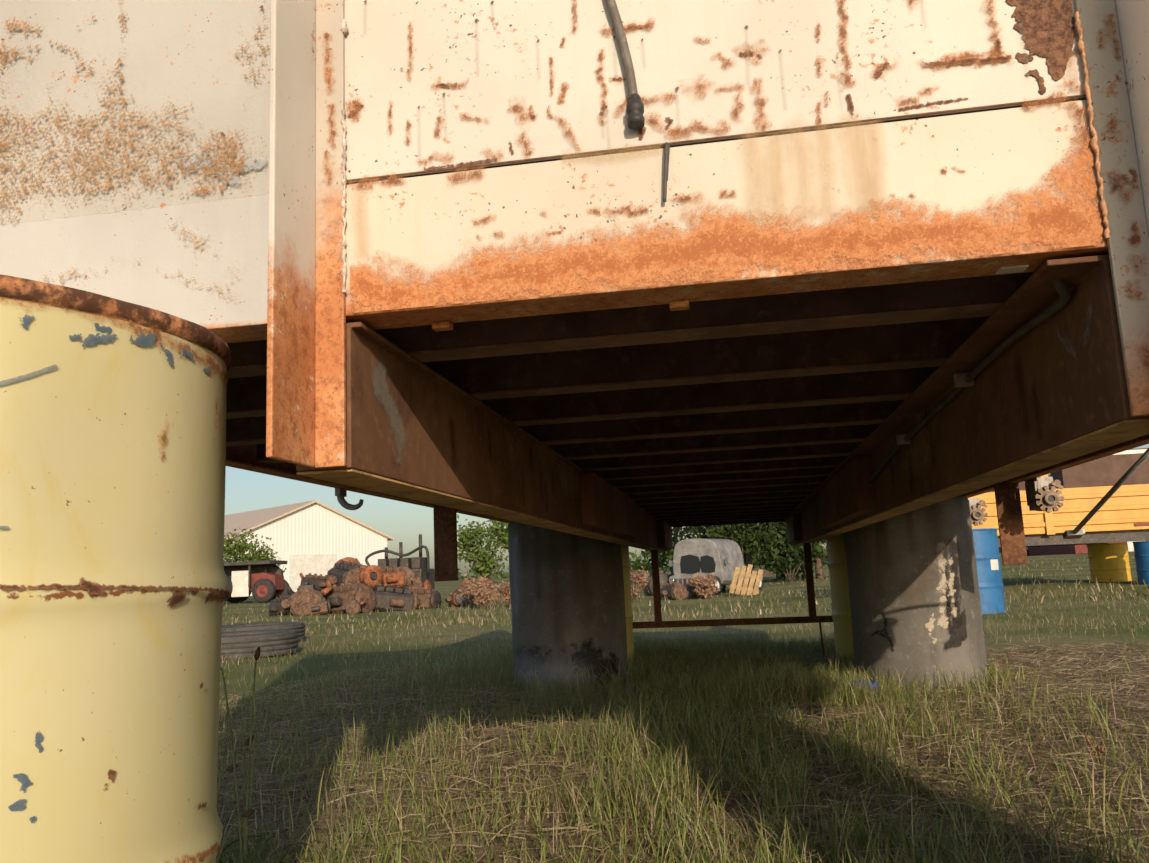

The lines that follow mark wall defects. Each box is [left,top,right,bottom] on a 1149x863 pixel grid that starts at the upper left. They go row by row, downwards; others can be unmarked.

spalling [925,542,957,644]